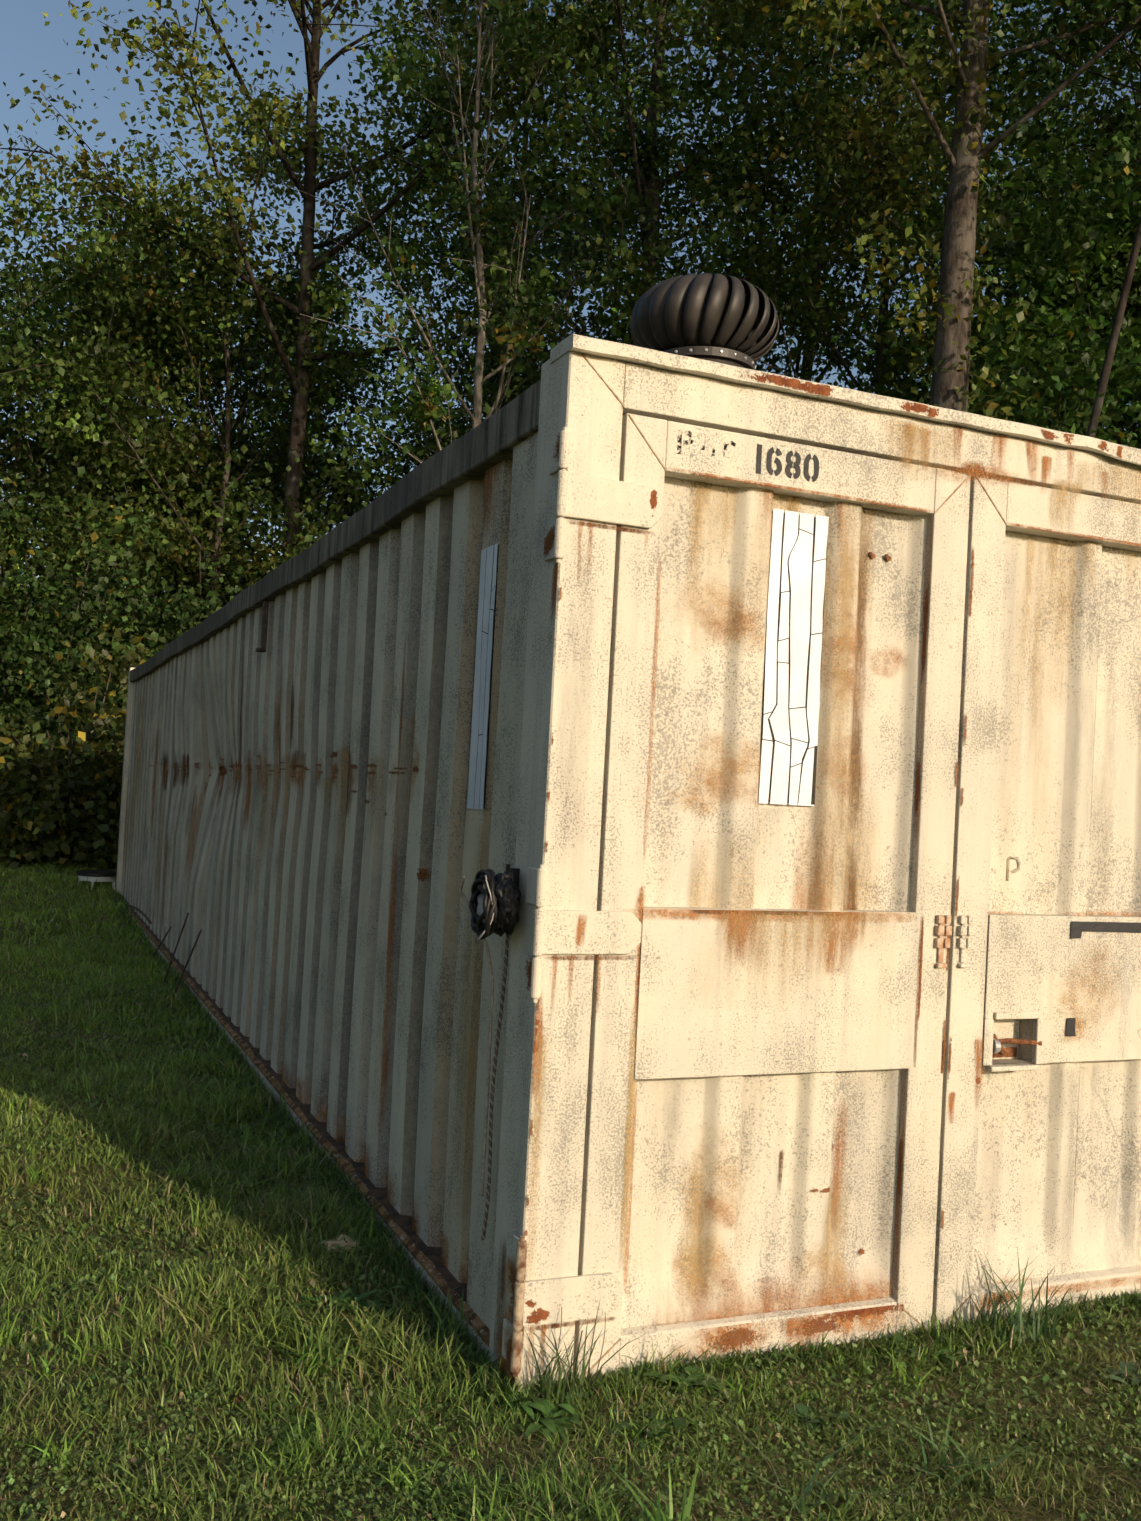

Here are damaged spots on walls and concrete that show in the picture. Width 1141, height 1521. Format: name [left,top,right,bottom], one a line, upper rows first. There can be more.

rust [954,429,1074,485]
rust [543,489,658,612]
rust [692,472,927,808]
rust [921,544,931,684]
rust [123,663,419,923]
rust [381,832,396,1107]
rust [638,842,881,971]
rust [552,918,641,1286]
rust [941,1019,955,1118]
rust [763,1128,904,1342]
rust [494,1247,612,1385]
rust [698,1303,764,1353]